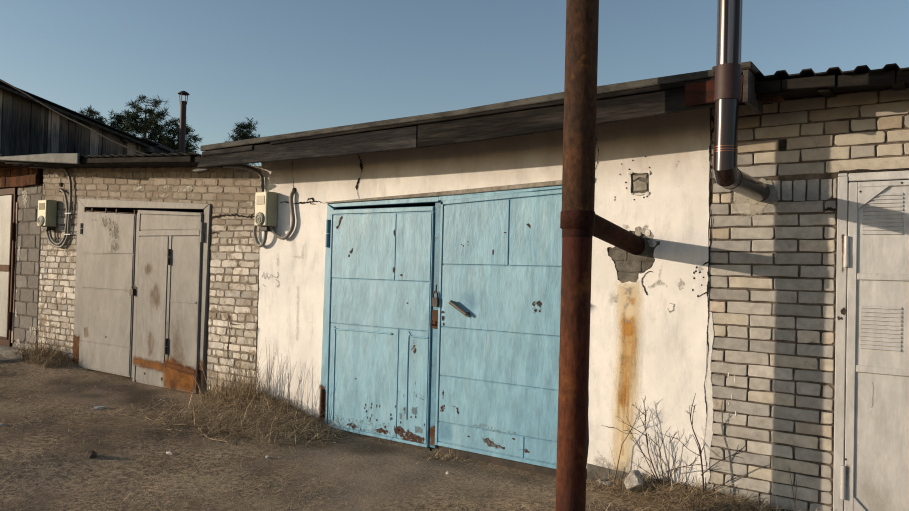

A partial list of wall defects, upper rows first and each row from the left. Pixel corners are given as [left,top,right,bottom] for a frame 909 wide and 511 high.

crack [355,154,363,194]
peeling [744,178,777,206]
flaking render [608,226,660,283]
crack [699,116,714,469]
corrosion [133,334,203,394]
corrosion [614,286,638,472]